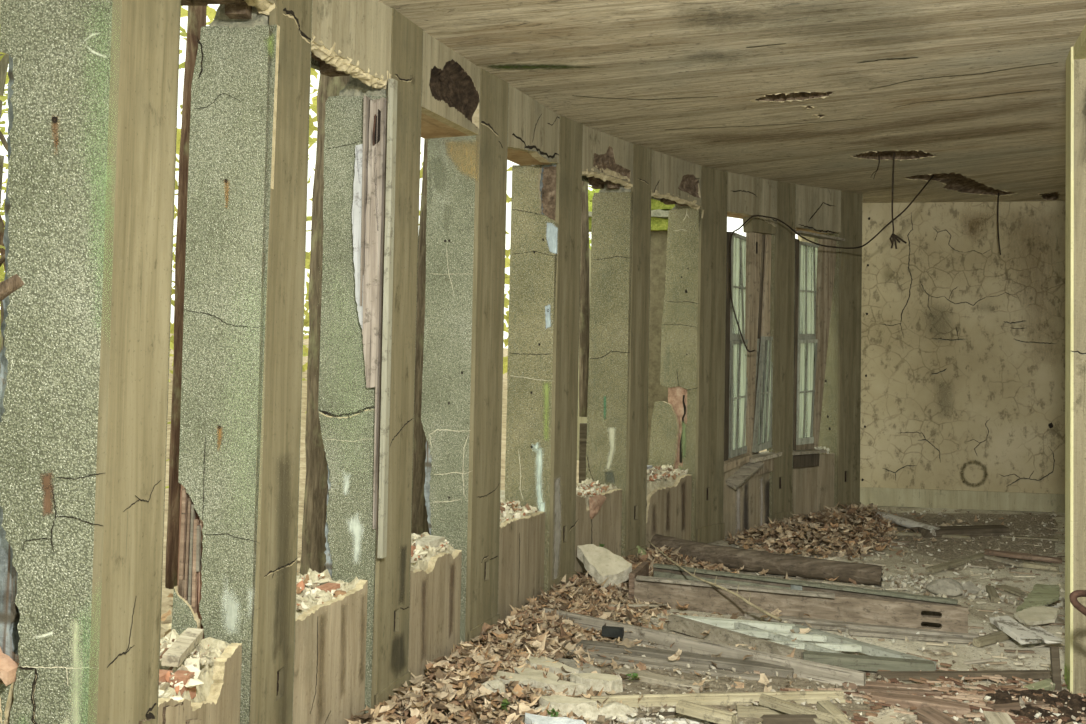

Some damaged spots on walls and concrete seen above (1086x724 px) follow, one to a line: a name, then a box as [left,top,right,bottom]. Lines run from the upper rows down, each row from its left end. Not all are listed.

spalling [245,0,275,15]
spalling [429,59,479,128]
spalling [750,91,835,118]
spalling [581,146,633,189]
spalling [651,174,700,210]
spalling [850,150,938,161]
spalling [903,172,1018,196]
crack [883,215,1086,355]
crack [883,432,941,480]
crack [1001,446,1055,486]
flaking render [178,488,201,614]
crack [19,599,136,724]